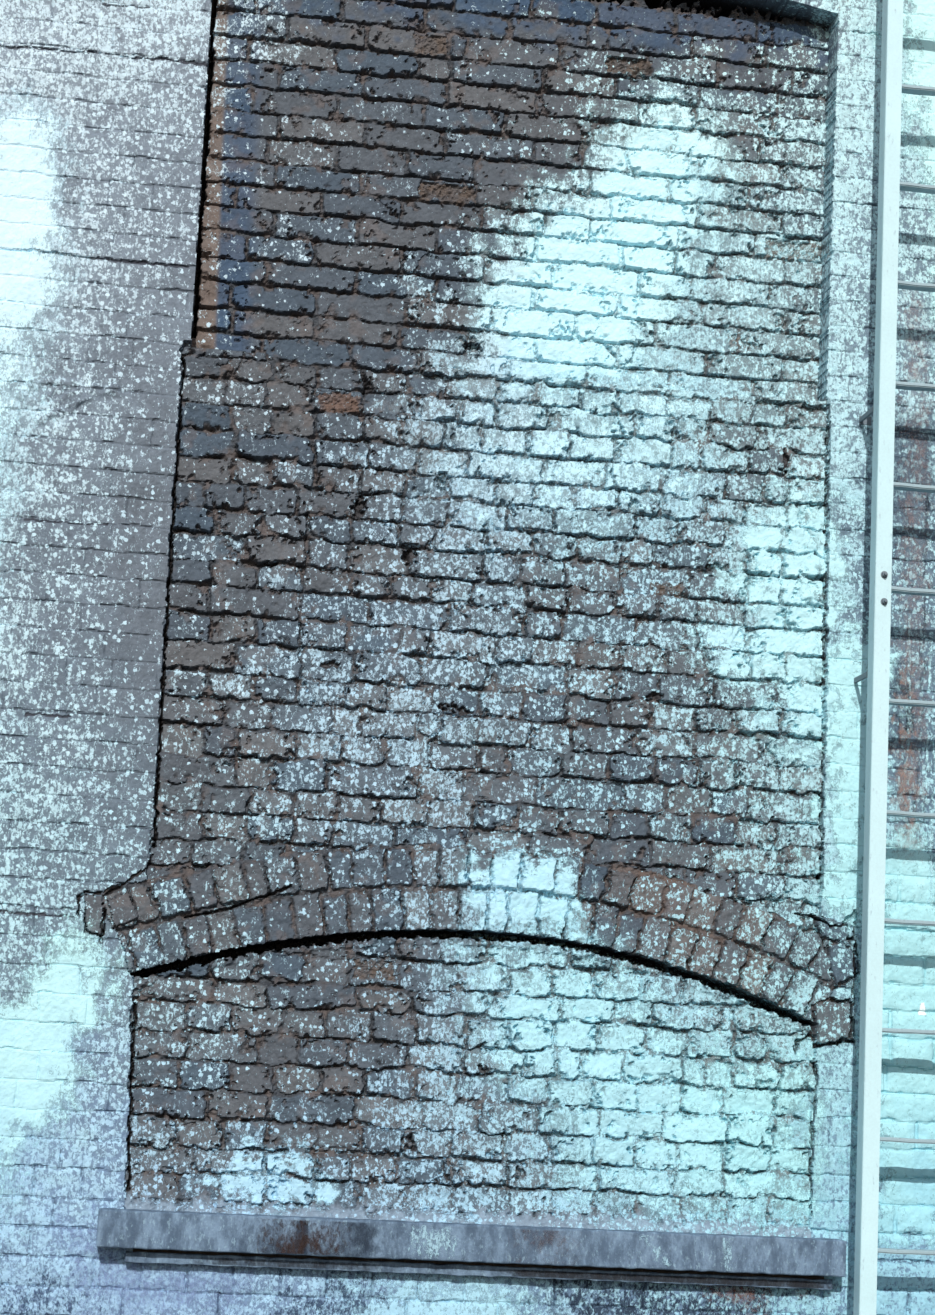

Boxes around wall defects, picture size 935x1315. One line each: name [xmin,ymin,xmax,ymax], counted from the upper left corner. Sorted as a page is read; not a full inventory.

water stain [0,78,99,596]
crack [0,0,218,944]
water stain [359,72,869,932]
water stain [893,422,931,522]
water stain [901,0,935,223]
water stain [0,906,127,1221]
crack [125,403,857,1217]
water stain [419,831,860,1270]
water stain [877,617,935,1277]